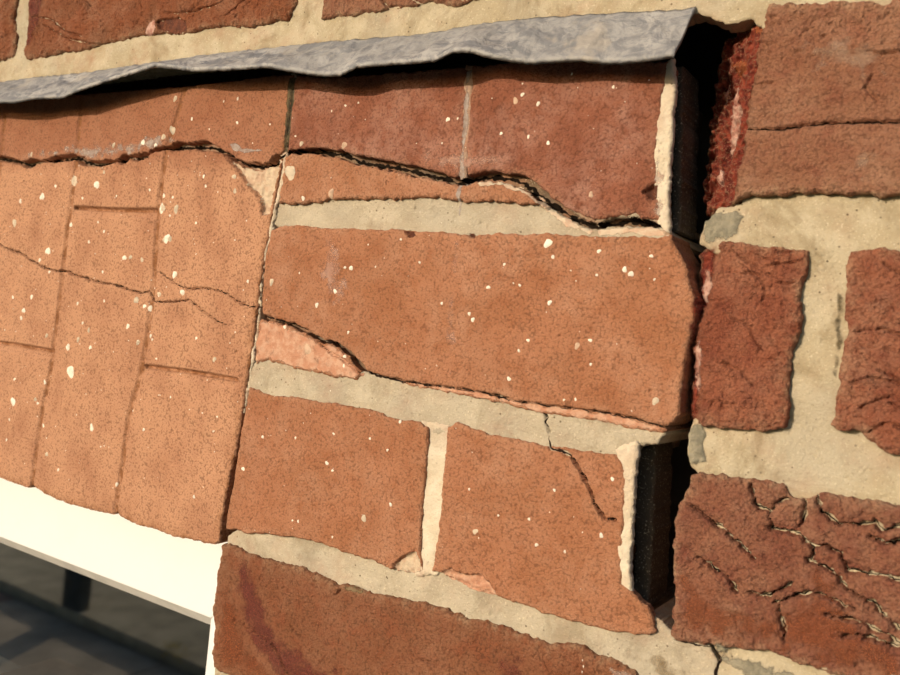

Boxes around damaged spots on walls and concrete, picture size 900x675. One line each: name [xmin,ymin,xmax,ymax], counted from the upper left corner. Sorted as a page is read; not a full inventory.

crack [0,146,662,229]
crack [0,243,666,521]
crack [701,487,900,646]
crack [676,640,722,675]